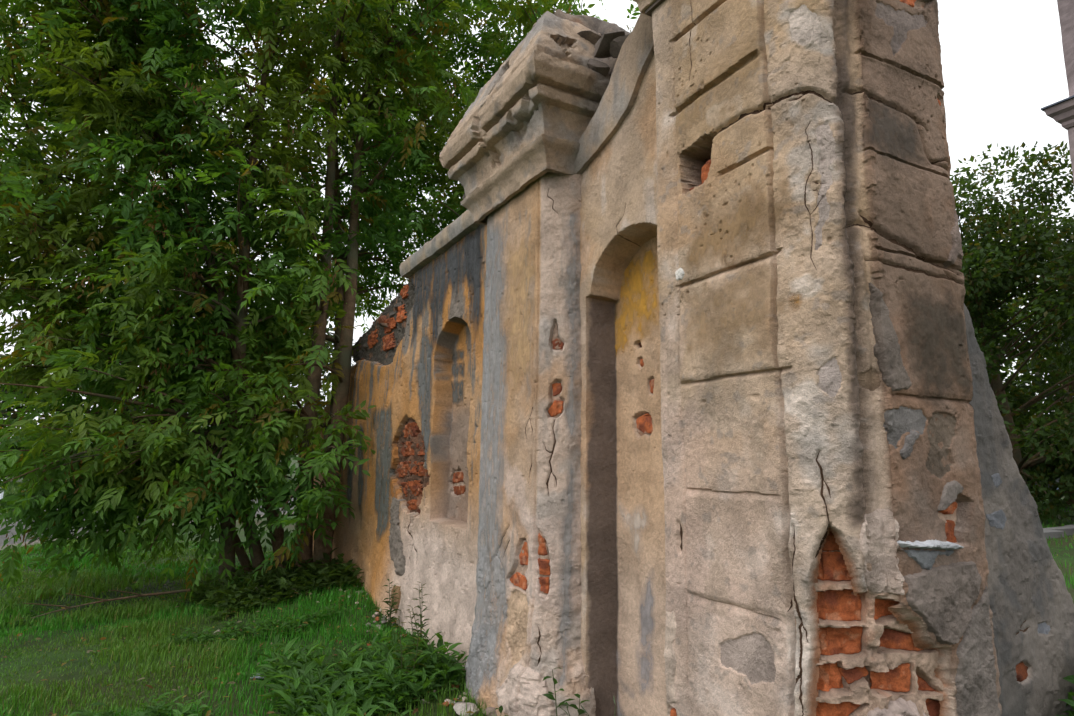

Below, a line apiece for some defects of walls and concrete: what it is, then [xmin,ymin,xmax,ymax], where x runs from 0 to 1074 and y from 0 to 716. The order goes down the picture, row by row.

crack [718,90,924,134]
hole [689,157,711,191]
crack [804,123,824,270]
spalling [352,282,416,365]
spalling [551,323,564,350]
spalling [395,418,430,515]
crack [525,407,557,494]
spalling [548,381,564,418]
spalling [636,413,653,436]
peeling [506,530,550,668]
crack [787,451,831,716]
spalling [814,531,944,716]